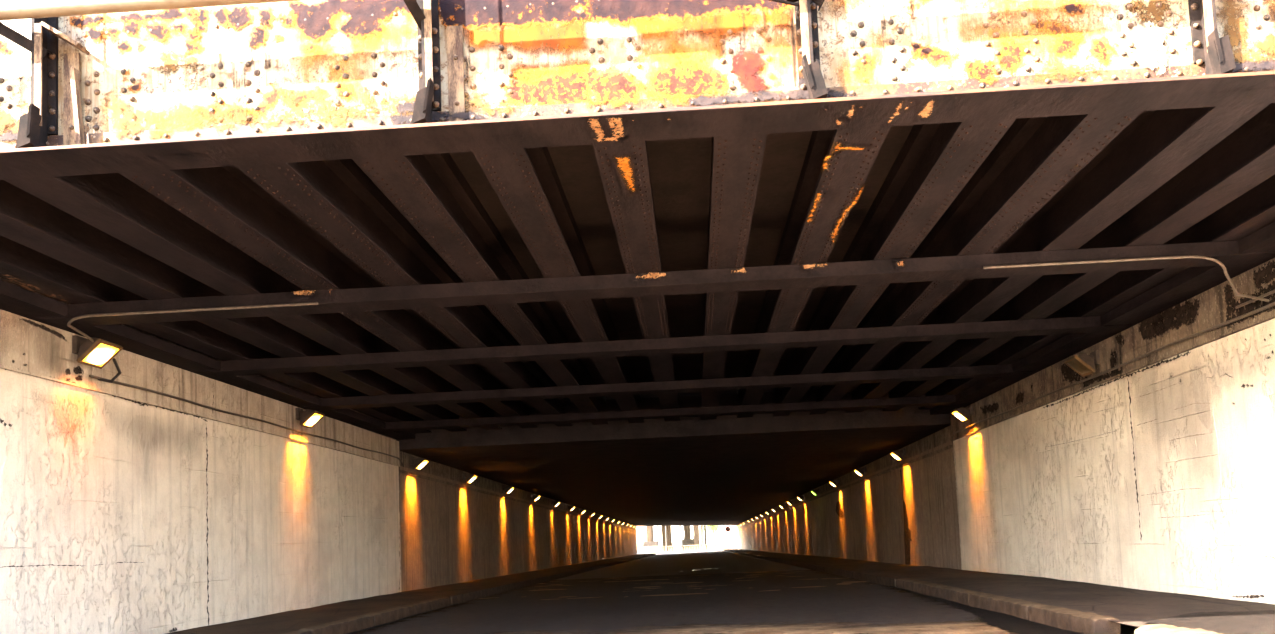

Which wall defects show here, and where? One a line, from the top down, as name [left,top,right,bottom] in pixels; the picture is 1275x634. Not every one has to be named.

rust [100,18,416,143]
rust [463,18,591,116]
rust [605,6,797,101]
rust [963,0,1107,83]
rust [1126,0,1171,27]
rust [1216,0,1275,64]
rust [616,157,635,192]
rust [823,142,864,170]
rust [831,188,862,243]
crack [1043,307,1273,539]
crack [112,384,214,626]
crack [0,561,144,569]